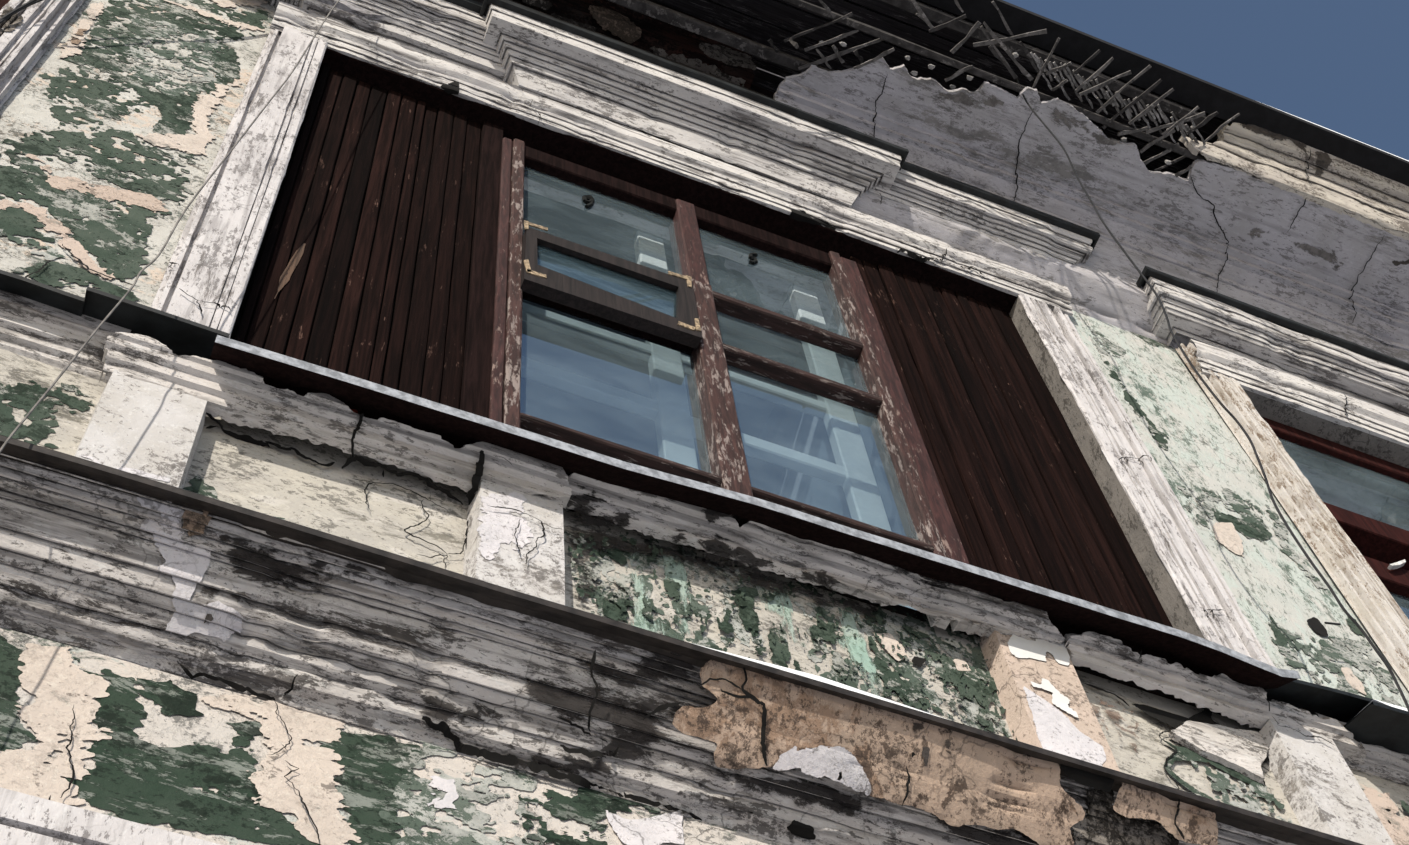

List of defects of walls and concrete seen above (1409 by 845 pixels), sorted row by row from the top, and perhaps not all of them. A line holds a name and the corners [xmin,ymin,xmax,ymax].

peeling [0,0,269,301]
crack [1014,109,1034,201]
crack [1190,176,1229,291]
peeling [0,380,94,449]
flaking render [81,455,243,642]
crack [206,412,560,567]
peeling [1177,485,1328,589]
crack [178,662,320,843]
peeling [0,635,684,845]
crack [422,650,702,821]
crack [643,668,768,766]
flaking render [564,528,1106,845]